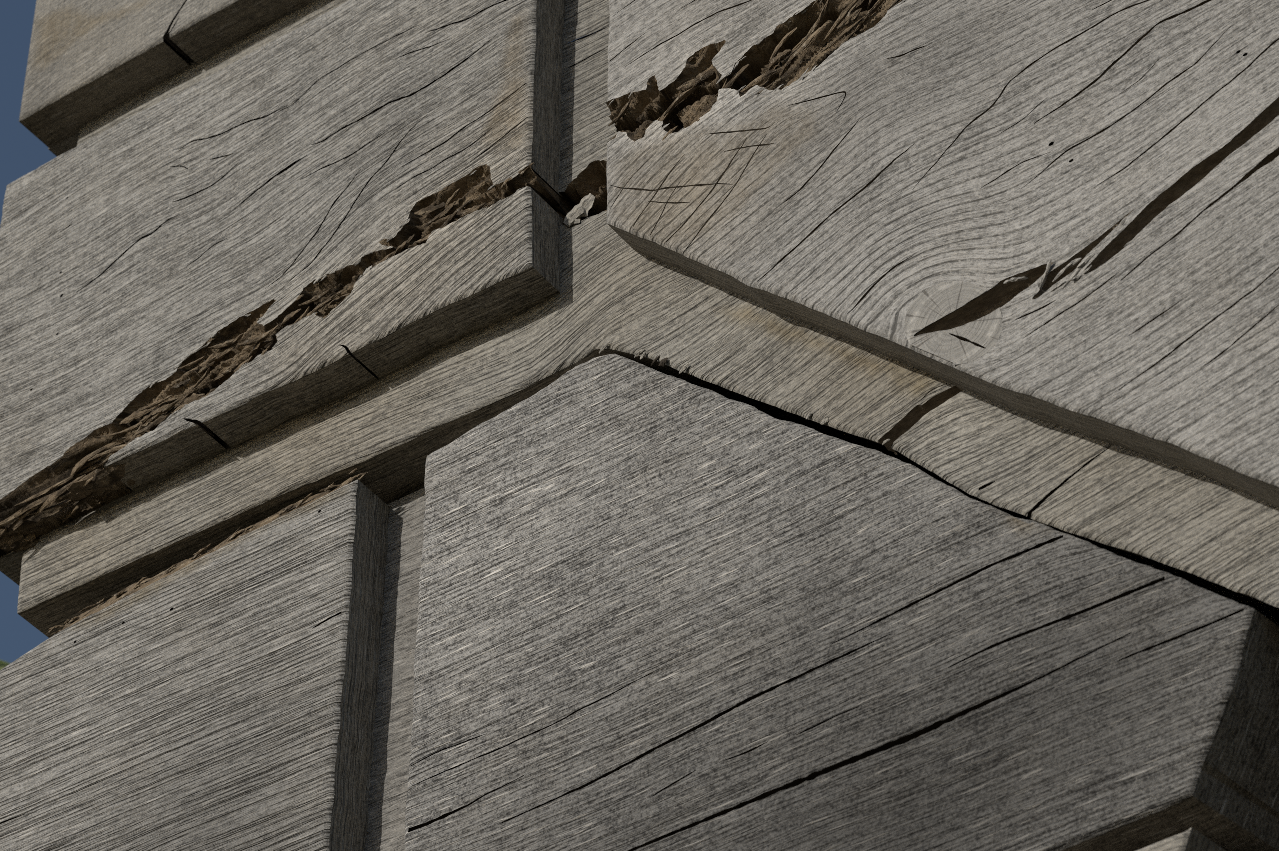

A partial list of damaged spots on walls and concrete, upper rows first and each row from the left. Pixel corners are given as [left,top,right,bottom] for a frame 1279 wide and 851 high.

peeling [362,162,534,275]
peeling [563,193,596,227]
peeling [645,0,906,141]
crack [757,0,1221,282]
crack [915,97,1279,349]
crack [1098,38,1279,185]
peeling [0,268,350,553]
peeling [322,468,368,495]
crack [878,383,962,455]
crack [500,446,1111,824]
crack [948,577,1165,668]
crack [628,609,1243,851]